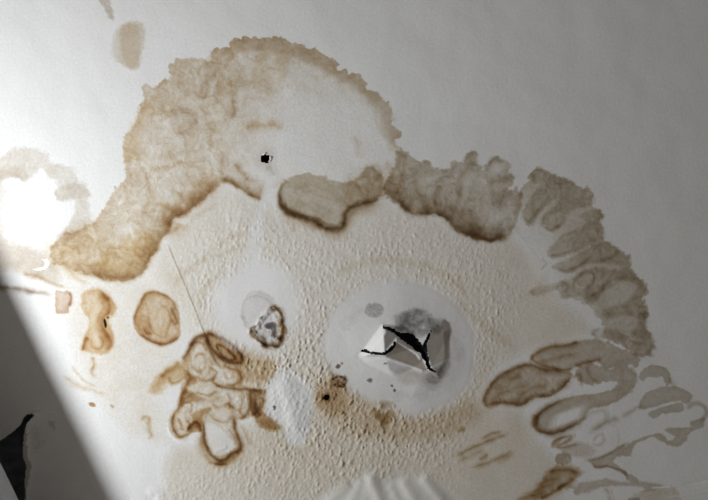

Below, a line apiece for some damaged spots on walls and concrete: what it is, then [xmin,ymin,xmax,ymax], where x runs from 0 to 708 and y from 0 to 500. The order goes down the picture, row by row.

water stain [98,0,146,71]
water stain [0,36,402,287]
spalling [247,302,290,354]
water stain [0,148,708,500]
crack [361,326,436,373]